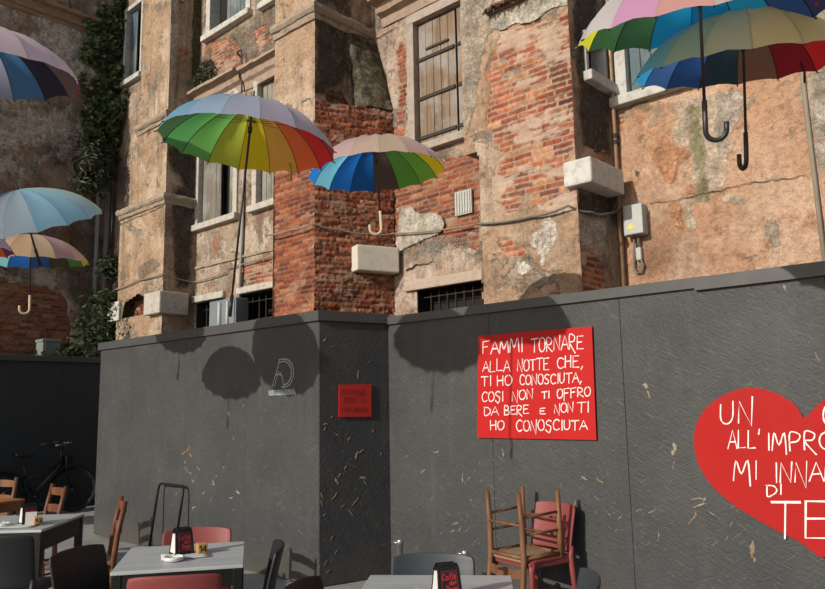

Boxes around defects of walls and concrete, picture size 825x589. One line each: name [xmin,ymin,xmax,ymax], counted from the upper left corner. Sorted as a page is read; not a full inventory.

water stain [315,20,350,100]
spalling [393,42,407,136]
spalling [461,0,610,213]
spalling [393,156,480,255]
crack [650,175,802,204]
spalling [498,239,526,257]
spalling [0,277,72,355]